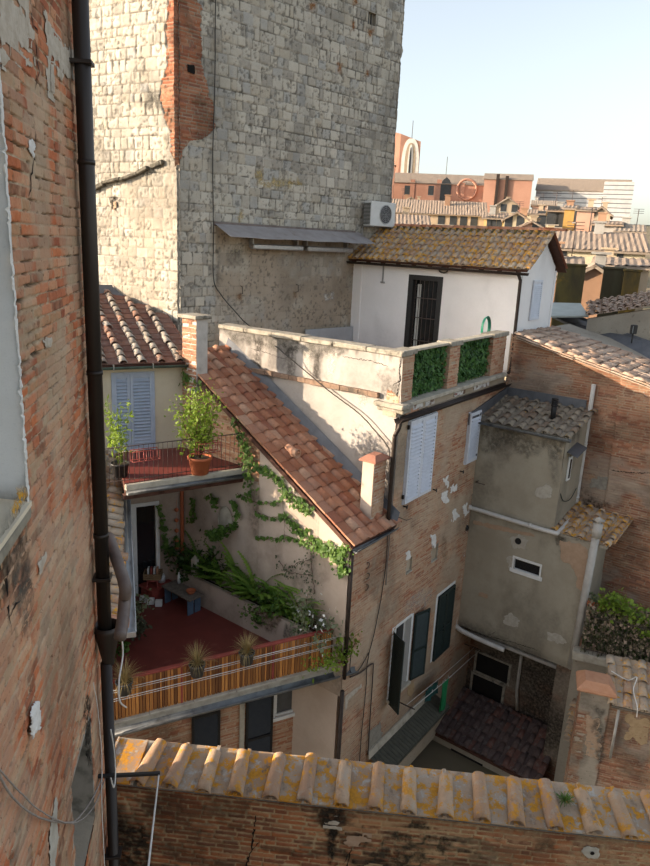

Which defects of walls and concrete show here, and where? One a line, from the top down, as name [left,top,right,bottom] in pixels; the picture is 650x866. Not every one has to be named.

spalling [160,0,216,167]
peeling [0,0,74,502]
crack [245,815,260,866]
leakage [315,808,344,863]